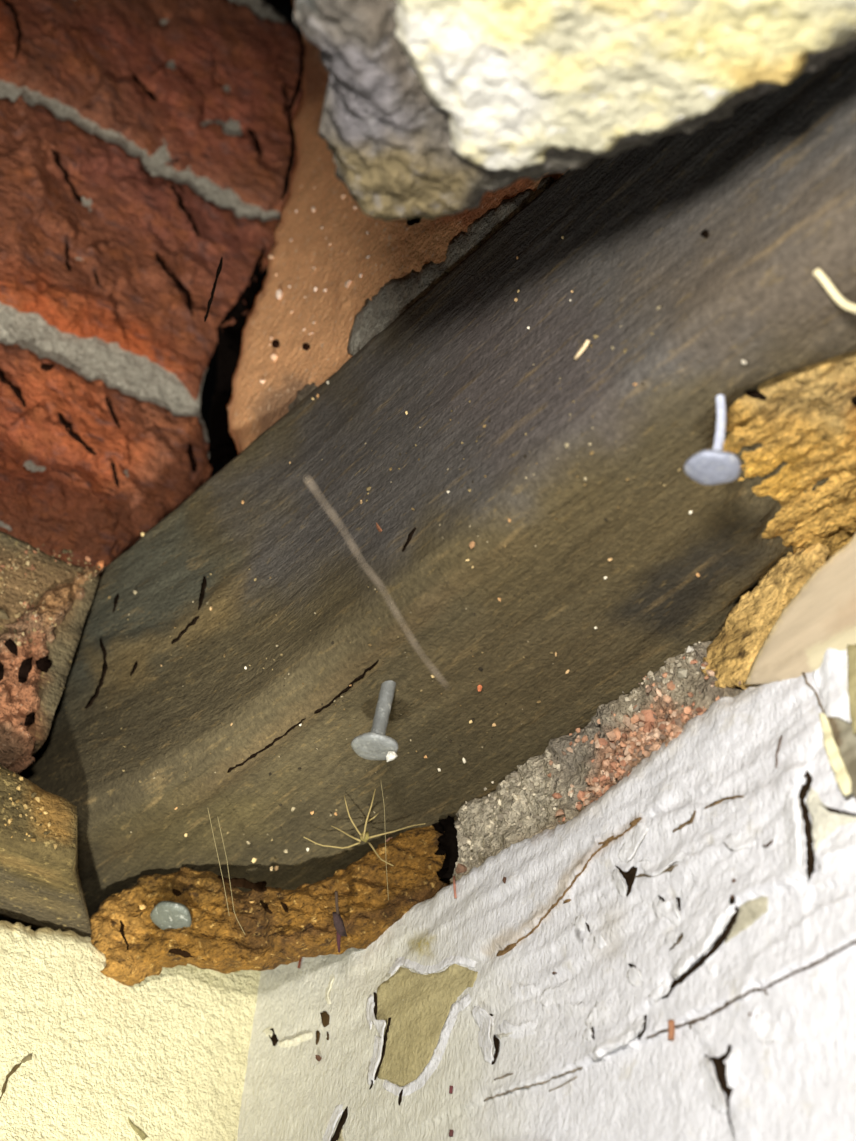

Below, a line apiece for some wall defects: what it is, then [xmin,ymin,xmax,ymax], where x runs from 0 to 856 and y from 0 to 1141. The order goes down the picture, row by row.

crack [246,128,263,157]
crack [268,0,304,200]
crack [170,185,200,238]
crack [155,248,265,473]
spalling [450,641,744,885]
peeling [611,823,686,897]
peeling [365,953,537,1105]
peeling [510,895,768,1061]
crack [646,940,856,1039]
crack [484,1067,583,1101]
peeling [699,1044,745,1136]